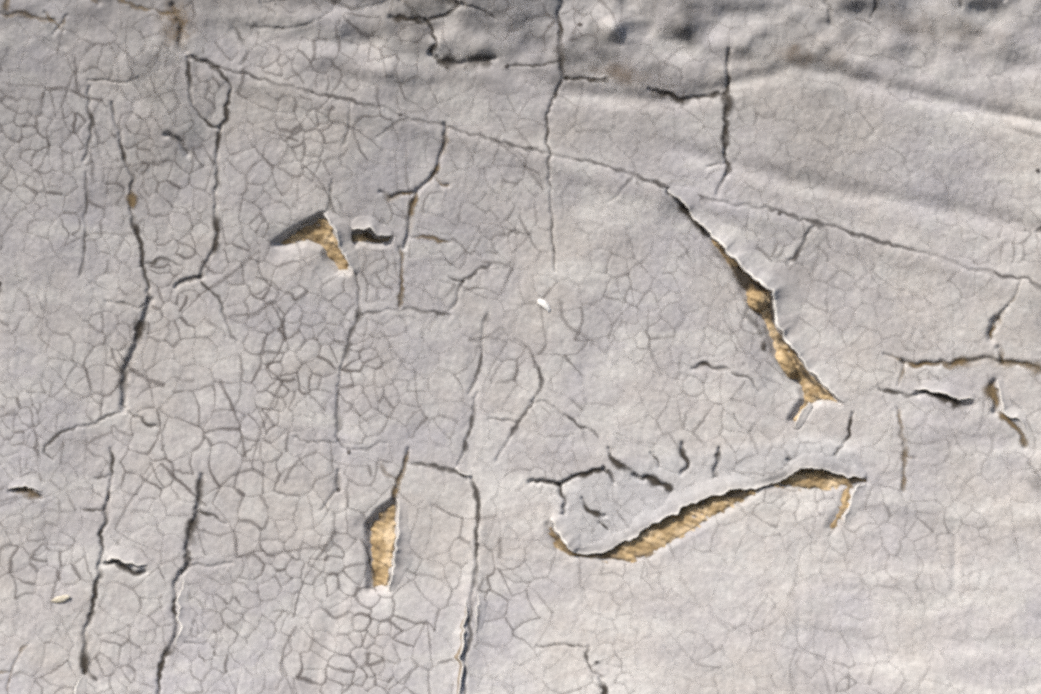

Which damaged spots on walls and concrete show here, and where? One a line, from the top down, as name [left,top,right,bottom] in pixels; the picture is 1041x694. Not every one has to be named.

crack [393,0,663,187]
crack [657,52,732,180]
crack [4,0,543,694]
peeling [280,211,393,274]
crack [699,361,752,380]
peeling [667,185,850,429]
crack [771,209,913,250]
crack [882,326,1040,487]
crack [995,273,1031,301]
peeling [368,498,413,592]
peeling [532,417,867,563]
crack [541,644,608,694]